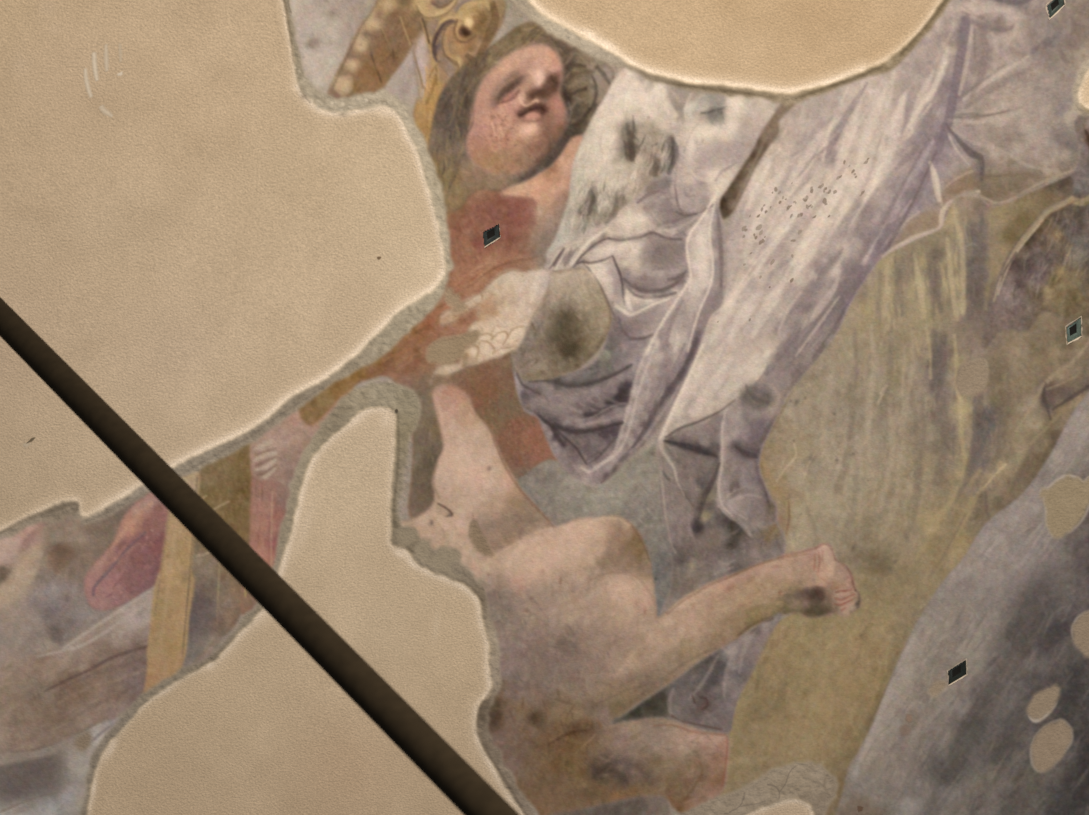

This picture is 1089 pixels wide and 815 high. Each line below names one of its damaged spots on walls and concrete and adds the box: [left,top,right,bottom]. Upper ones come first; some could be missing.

flaking render [508,0,950,105]
flaking render [1073,59,1089,116]
flaking render [0,0,453,476]
flaking render [0,337,149,537]
flaking render [273,379,537,815]
flaking render [81,603,463,815]
flaking render [672,762,837,815]